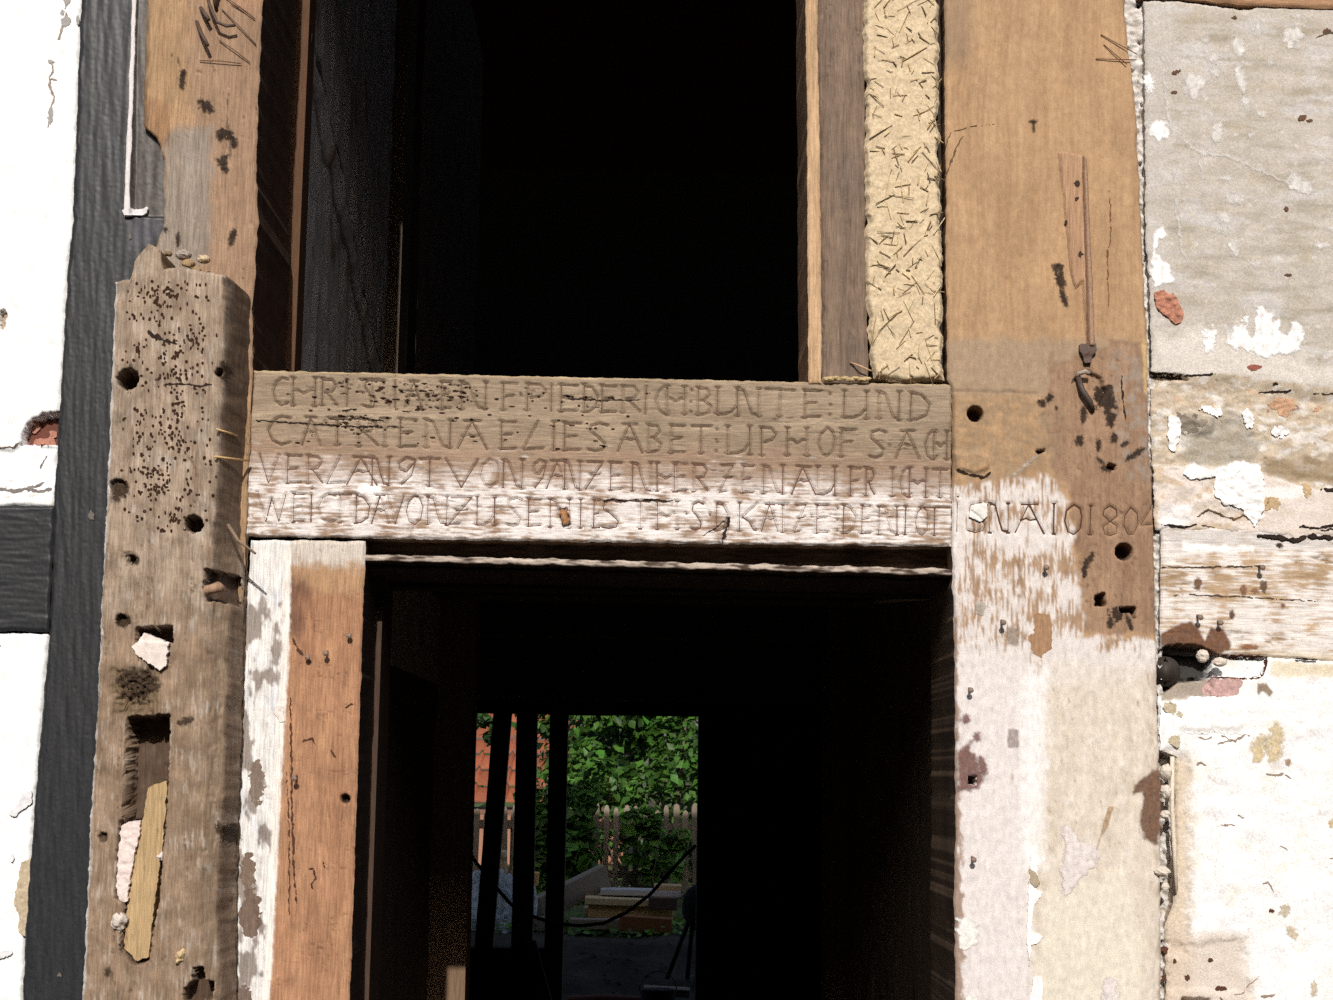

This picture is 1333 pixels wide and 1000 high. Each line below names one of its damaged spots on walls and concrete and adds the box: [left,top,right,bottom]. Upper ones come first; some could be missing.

peeling [1149,227,1184,324]
peeling [1201,306,1305,371]
peeling [1166,405,1223,452]
flaking render [1242,397,1322,438]
flaking render [969,502,988,522]
peeling [1183,460,1281,527]
crack [1162,498,1333,602]
peeling [1028,613,1053,658]
flaking render [1201,677,1243,697]
peeling [955,917,980,950]
peeling [1026,847,1043,1000]
spalling [1161,945,1190,982]